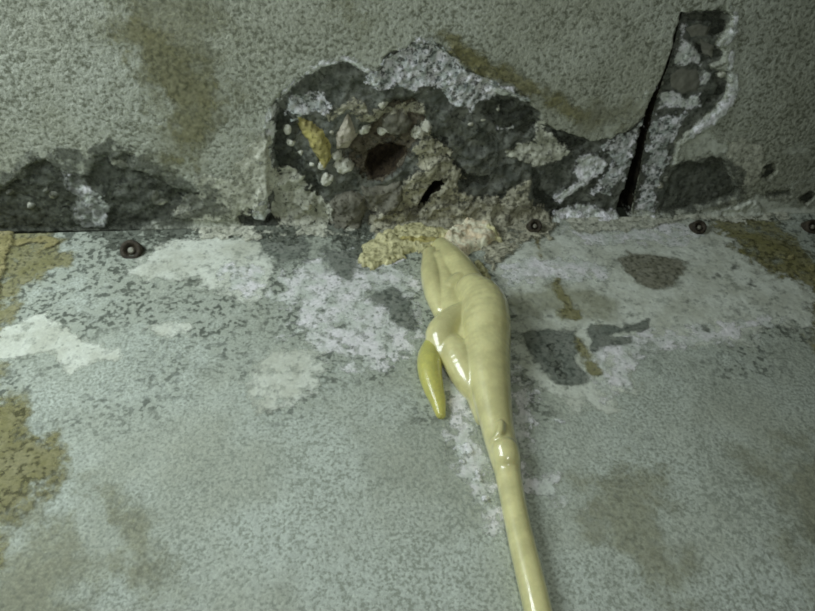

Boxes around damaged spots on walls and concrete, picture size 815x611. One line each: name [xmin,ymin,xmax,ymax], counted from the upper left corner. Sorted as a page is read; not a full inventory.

leakage [0,16,477,260]
spalling [238,5,740,280]
crack [616,12,683,217]
spalling [0,152,199,233]
peeling [370,287,418,331]
peeling [523,329,588,386]
peeling [587,318,650,352]
peeling [618,251,685,290]